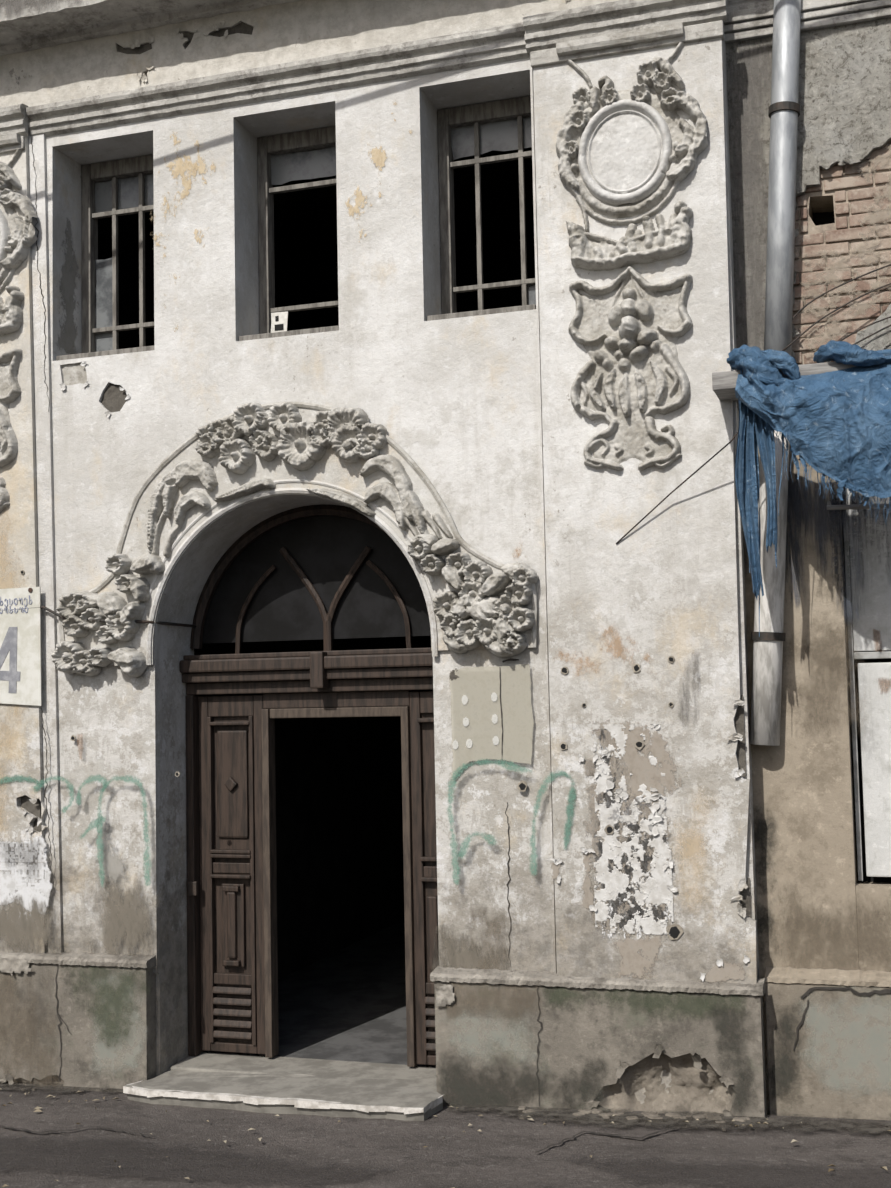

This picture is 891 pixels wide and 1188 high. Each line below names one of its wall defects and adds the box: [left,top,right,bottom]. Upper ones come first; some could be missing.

spalling [117,36,154,82]
spalling [175,21,254,49]
peeling [58,221,88,391]
spalling [792,140,891,365]
spalling [101,383,130,418]
leakage [786,467,865,616]
spalling [21,796,42,835]
crack [504,802,512,966]
peeling [579,720,682,941]
crack [535,986,543,1106]
spalling [582,1043,736,1116]
crack [793,987,891,1050]